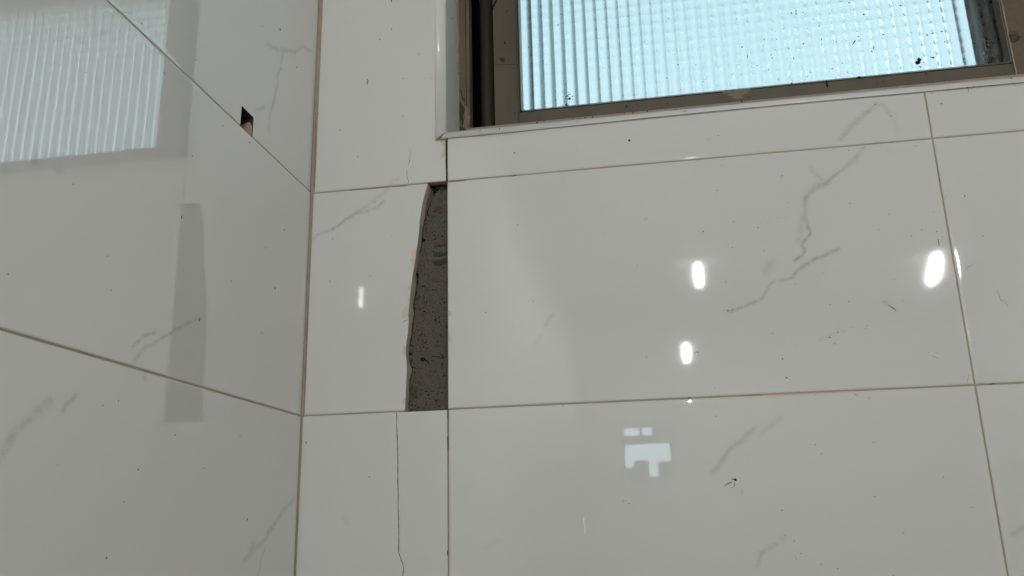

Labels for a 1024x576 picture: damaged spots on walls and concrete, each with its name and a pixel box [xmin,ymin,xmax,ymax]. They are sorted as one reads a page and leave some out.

crack [396,201,444,574]
spalling [395,184,452,413]